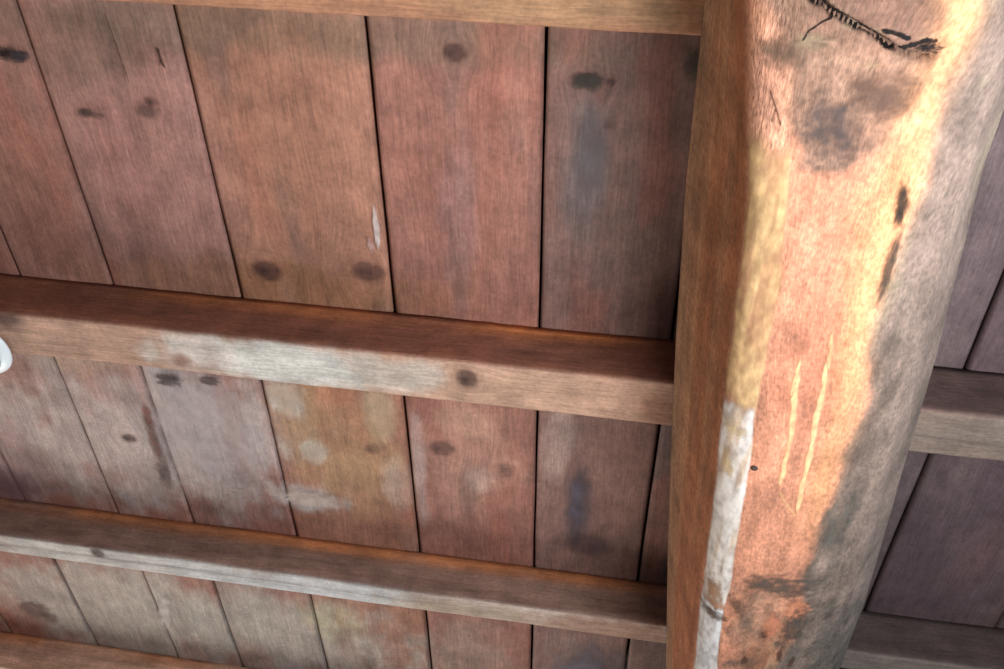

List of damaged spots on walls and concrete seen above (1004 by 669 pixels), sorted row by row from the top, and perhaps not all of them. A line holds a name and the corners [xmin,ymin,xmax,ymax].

crack [802,0,943,54]
damp [860,83,901,110]
damp [812,108,849,150]
peeling [694,143,790,669]
damp [748,578,810,639]